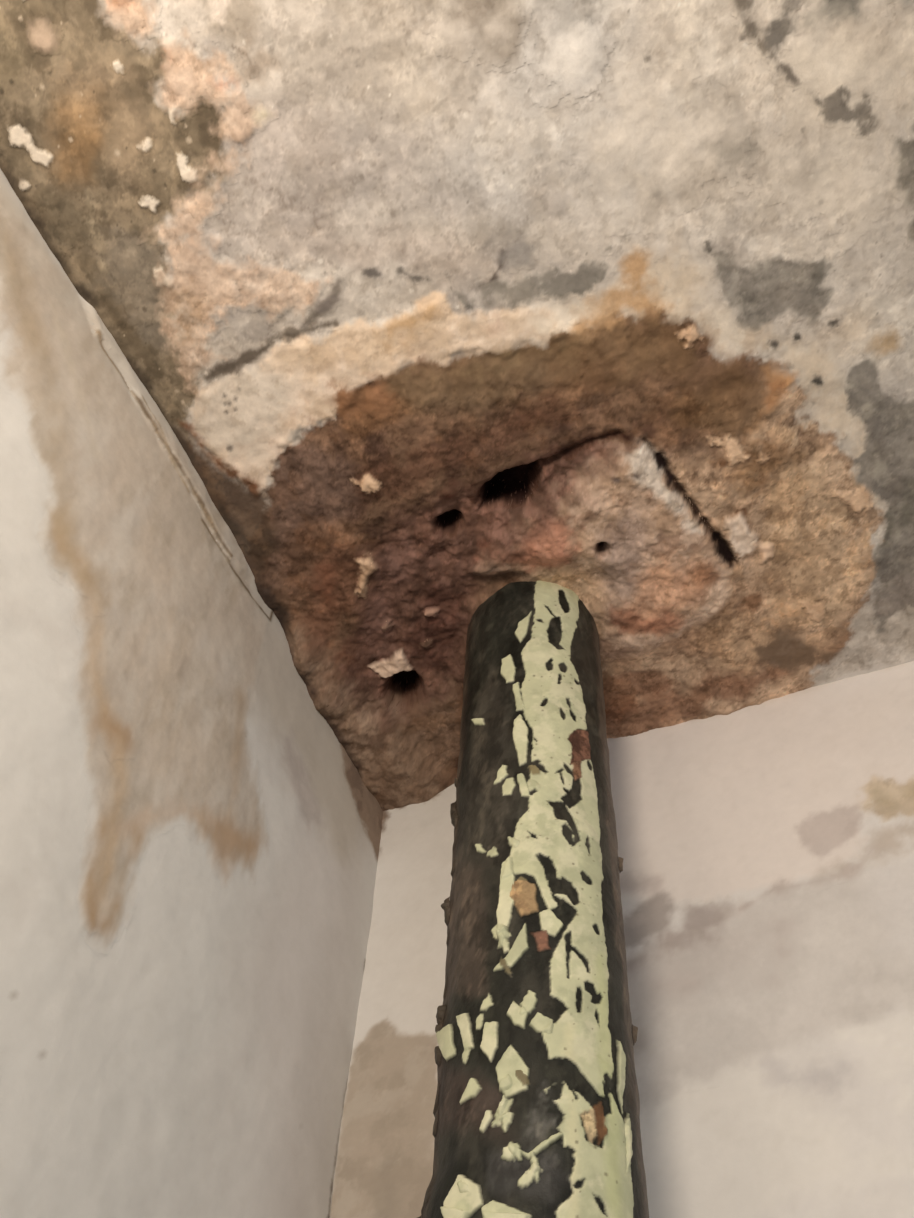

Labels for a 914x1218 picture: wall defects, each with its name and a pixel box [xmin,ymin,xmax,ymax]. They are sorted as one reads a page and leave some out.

peeling [158,0,914,486]
water stain [0,0,344,956]
crack [467,480,490,504]
corrosion [183,241,886,738]
crack [534,429,740,573]
corrosion [407,690,463,772]
corrosion [566,727,592,782]
peeling [475,836,564,978]
water stain [619,772,914,1119]
water stain [330,1013,439,1218]
peeling [440,1174,533,1218]
peeling [436,990,564,1190]